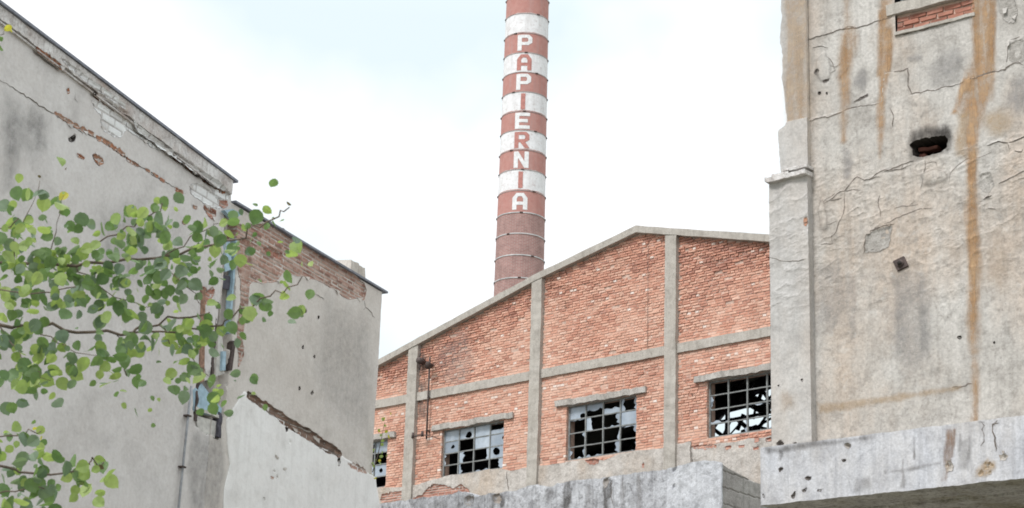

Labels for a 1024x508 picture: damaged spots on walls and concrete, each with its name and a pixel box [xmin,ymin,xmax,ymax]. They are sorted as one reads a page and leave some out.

rust [786,0,808,122]
rust [840,40,852,100]
crack [808,16,950,79]
rust [879,2,892,137]
crack [886,36,1023,94]
crack [0,80,193,206]
peeling [36,47,229,221]
crack [770,135,1024,262]
spalling [910,135,948,157]
rust [953,0,995,343]
flaking render [226,224,367,367]
peeling [223,391,474,508]